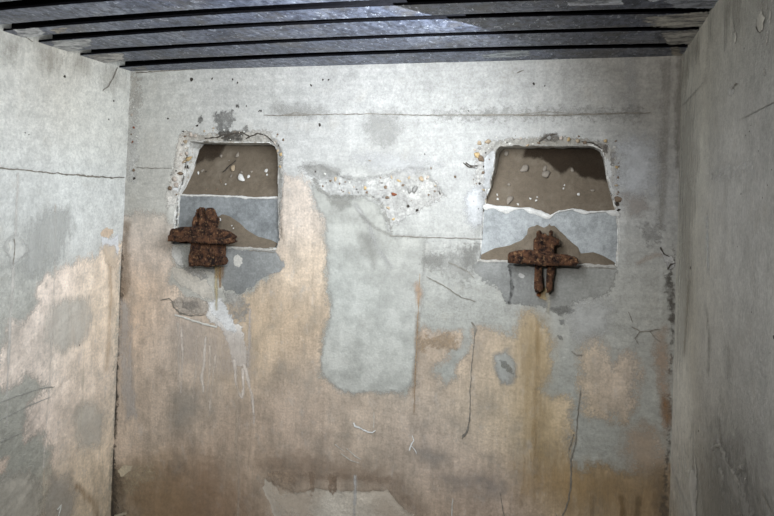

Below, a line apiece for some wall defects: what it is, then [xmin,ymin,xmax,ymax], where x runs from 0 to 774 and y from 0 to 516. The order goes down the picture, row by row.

crack [0,167,165,179]
spalling [165,105,284,225]
spalling [297,155,443,232]
crack [390,233,470,241]
spalling [464,133,622,226]
leakage [618,136,666,215]
leakage [665,259,676,341]
leakage [111,253,150,516]
leakage [206,279,255,422]
crack [462,322,477,438]
peeling [262,471,414,516]
crack [555,390,581,516]